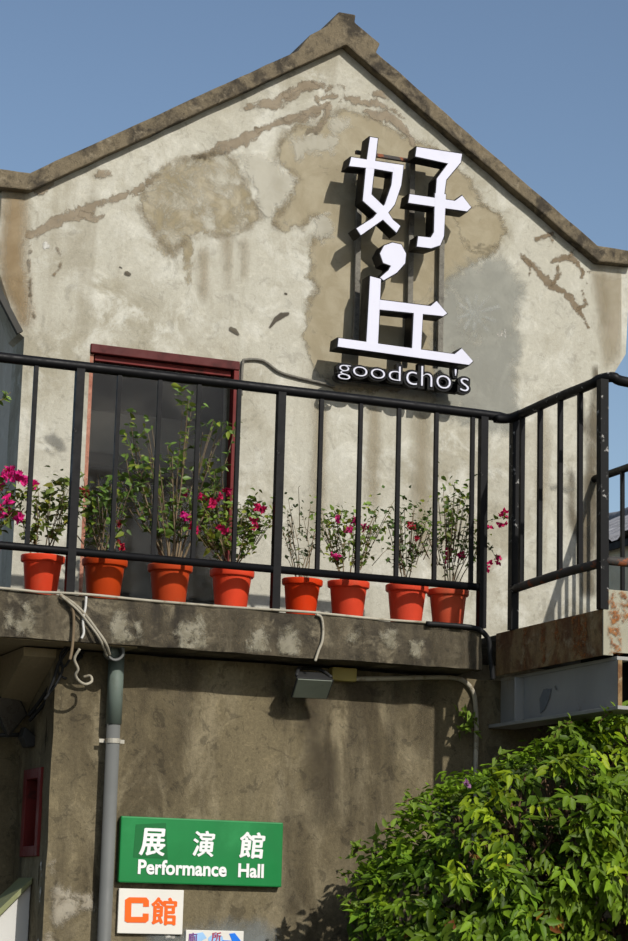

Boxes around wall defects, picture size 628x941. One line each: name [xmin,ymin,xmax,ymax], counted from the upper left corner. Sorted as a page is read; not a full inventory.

flaking render [141,108,507,393]
rust [608,592,628,652]